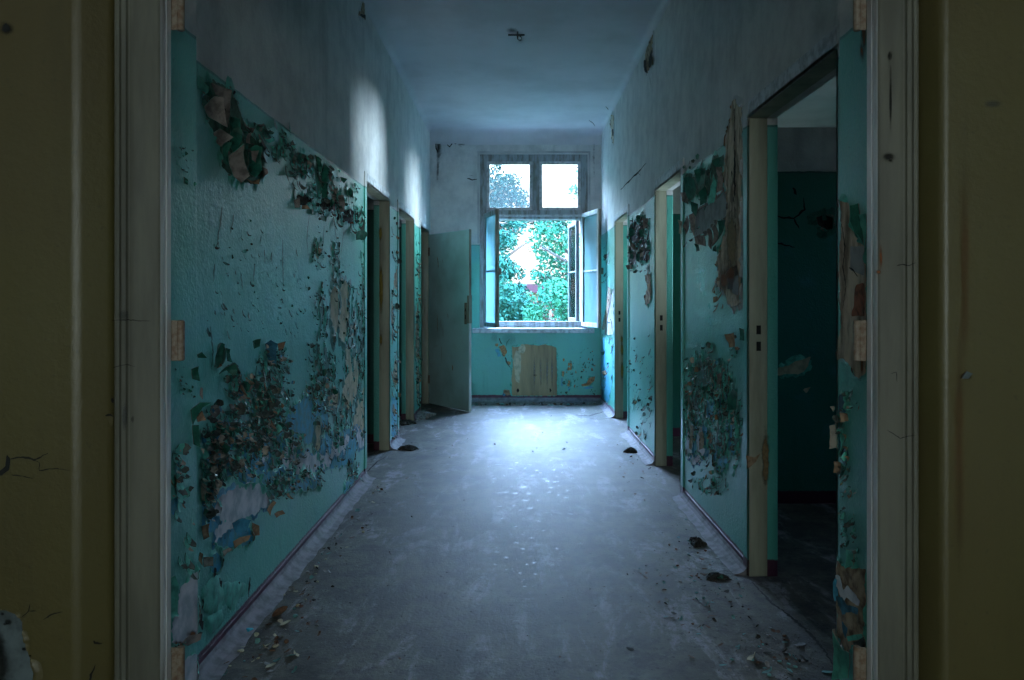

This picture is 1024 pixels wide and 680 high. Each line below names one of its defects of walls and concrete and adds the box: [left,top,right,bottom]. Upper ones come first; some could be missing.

crack [0,453,64,479]
peeling [197,70,268,192]
peeling [171,236,367,680]
flaking render [510,241,653,444]
peeling [626,209,653,309]
spalling [678,95,744,314]
peeling [682,328,769,496]
spalling [829,194,867,680]